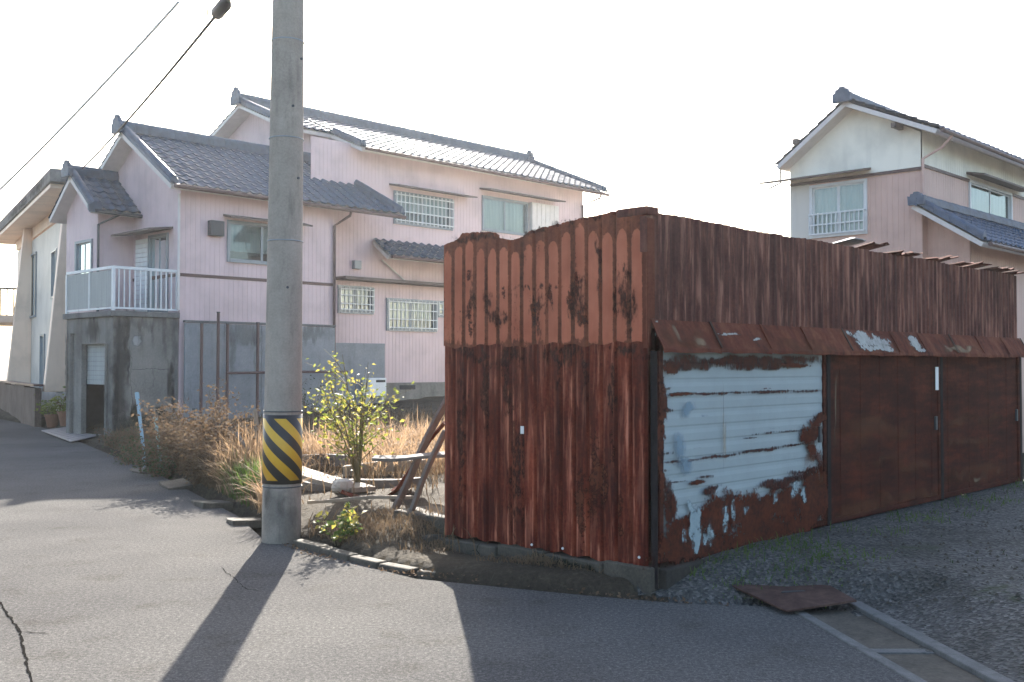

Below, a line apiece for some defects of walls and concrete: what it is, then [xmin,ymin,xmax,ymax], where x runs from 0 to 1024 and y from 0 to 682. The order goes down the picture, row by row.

peeling [846,330,894,352]
peeling [908,335,926,352]
corrosion [445,216,835,569]
peeling [682,499,749,554]